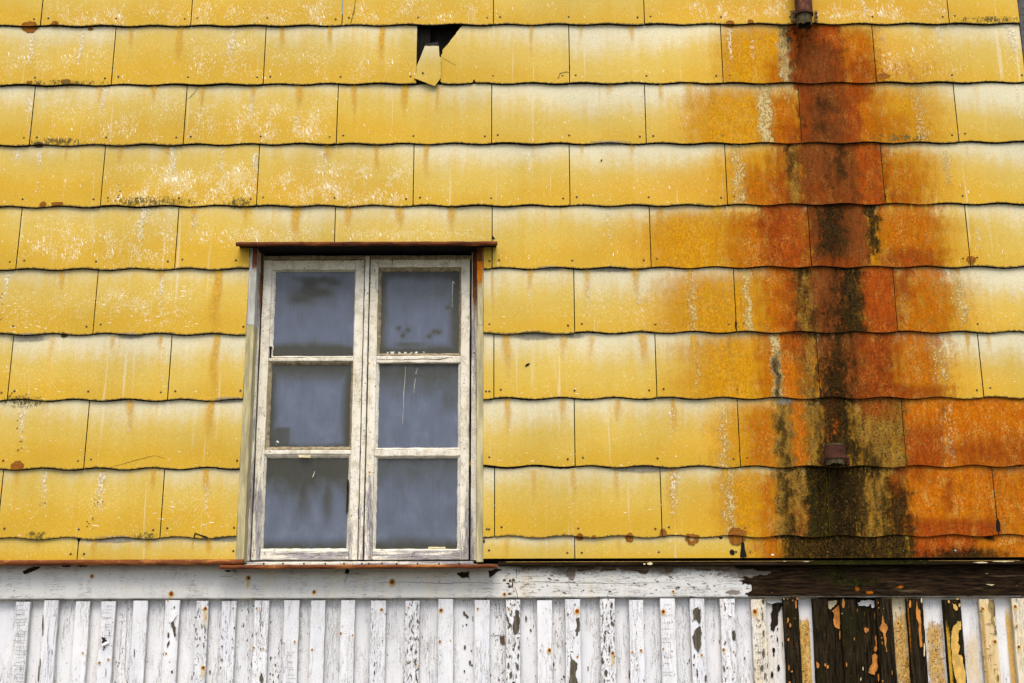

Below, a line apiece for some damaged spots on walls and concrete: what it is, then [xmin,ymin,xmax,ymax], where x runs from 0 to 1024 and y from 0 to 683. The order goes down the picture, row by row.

leakage [731,145,748,203]
leakage [754,24,824,203]
leakage [742,268,754,331]
rust [652,24,1024,558]
leakage [769,204,1009,558]
leakage [716,398,737,535]
peeling [565,561,711,581]
peeling [706,560,1024,683]